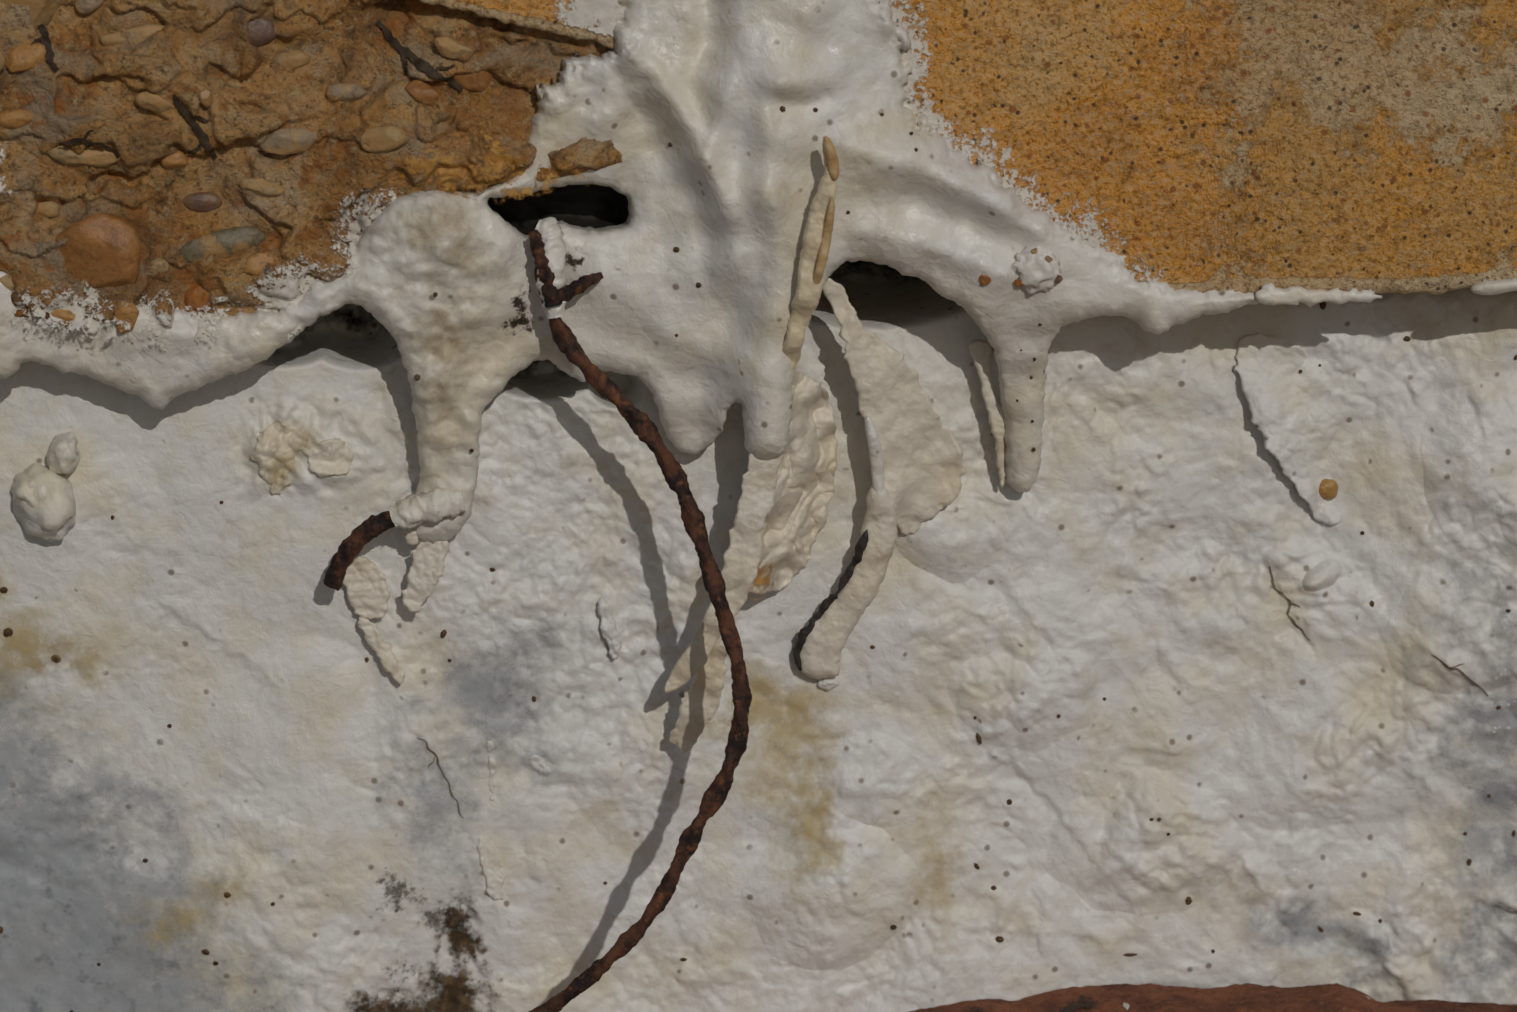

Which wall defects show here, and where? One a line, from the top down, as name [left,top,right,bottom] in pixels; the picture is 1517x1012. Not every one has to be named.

spalling [0,0,622,334]
water stain [0,677,223,1012]